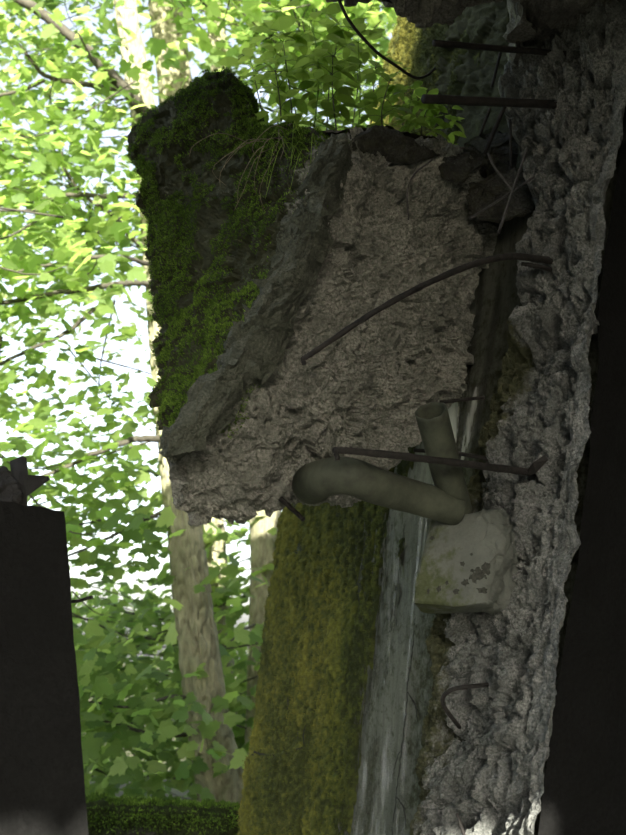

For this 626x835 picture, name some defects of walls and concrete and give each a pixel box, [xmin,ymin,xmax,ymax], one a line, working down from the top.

spalling [158,133,353,464]
spalling [278,497,305,521]
spalling [301,0,626,835]